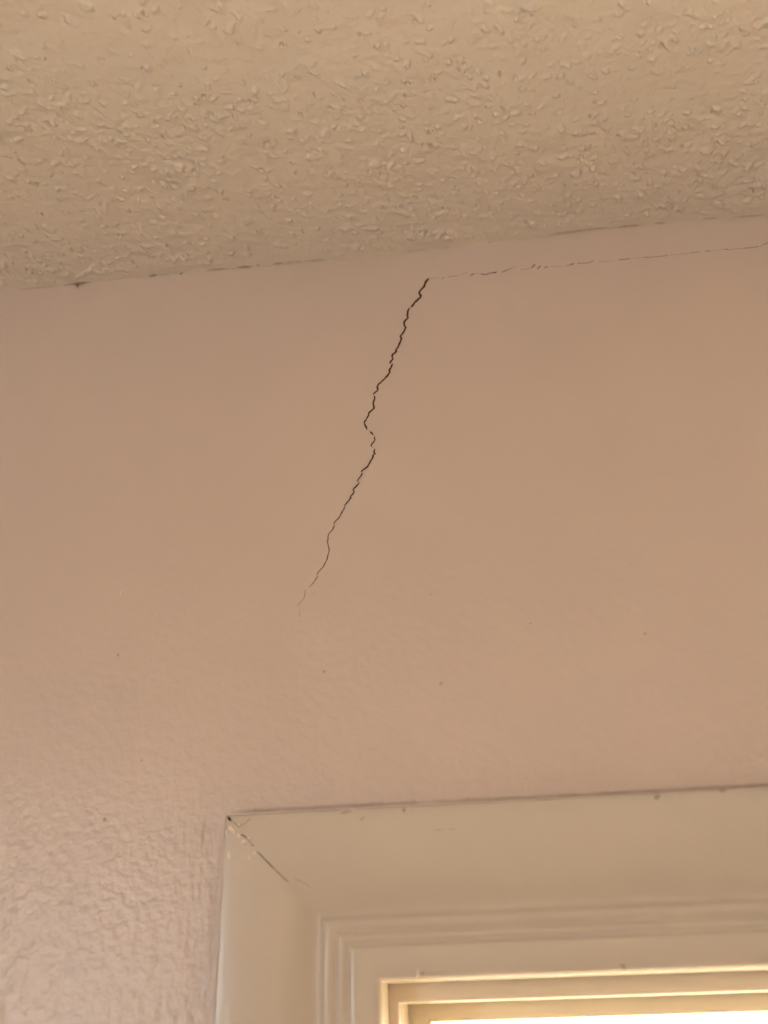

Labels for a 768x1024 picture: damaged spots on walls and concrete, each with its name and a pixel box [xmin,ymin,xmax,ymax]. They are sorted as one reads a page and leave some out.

crack [315,278,429,580]
crack [227,816,274,869]